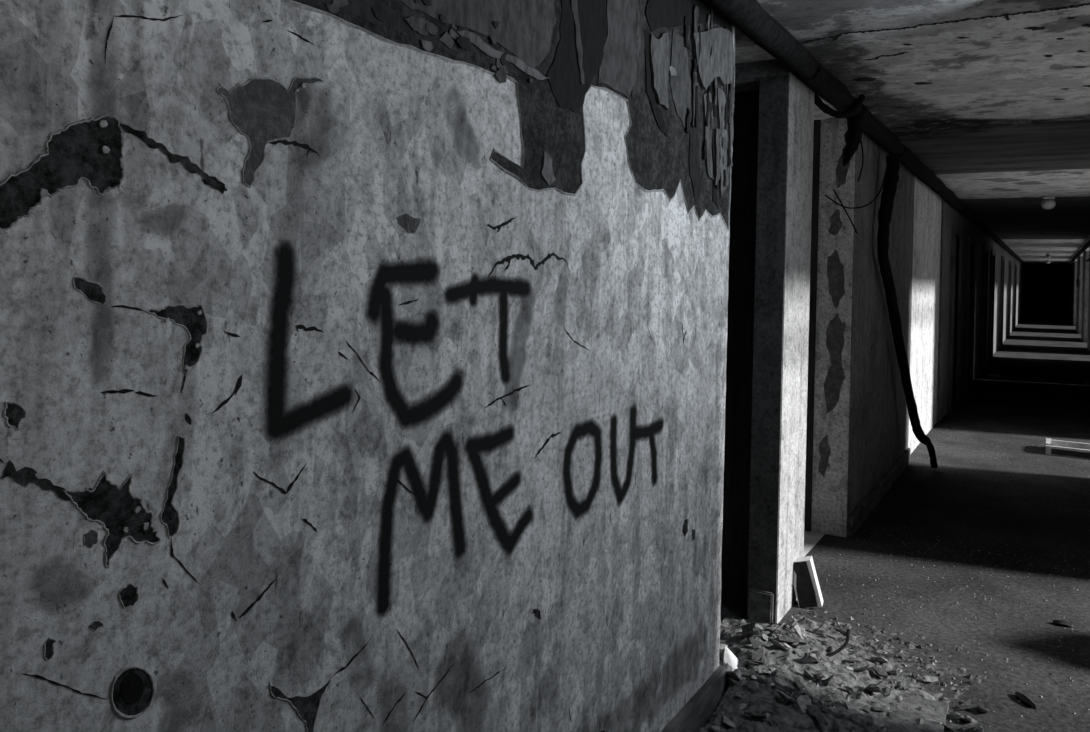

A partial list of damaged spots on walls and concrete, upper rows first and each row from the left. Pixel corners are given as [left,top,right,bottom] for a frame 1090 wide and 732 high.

peeling [281,0,735,230]
peeling [835,154,851,189]
spalling [396,213,420,234]
crack [111,304,143,312]
peeling [823,208,846,416]
peeling [818,434,832,478]